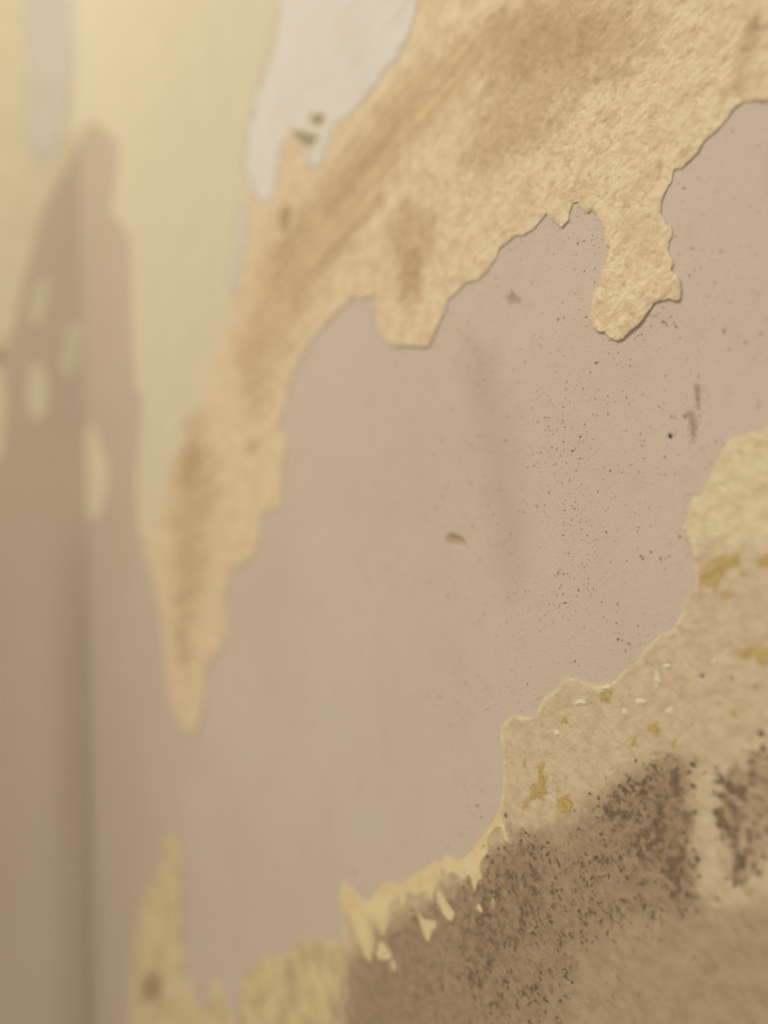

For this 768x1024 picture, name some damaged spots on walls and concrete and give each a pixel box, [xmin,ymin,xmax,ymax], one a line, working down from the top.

peeling [0,0,768,735]
peeling [236,427,768,1024]
damp [335,739,768,1024]